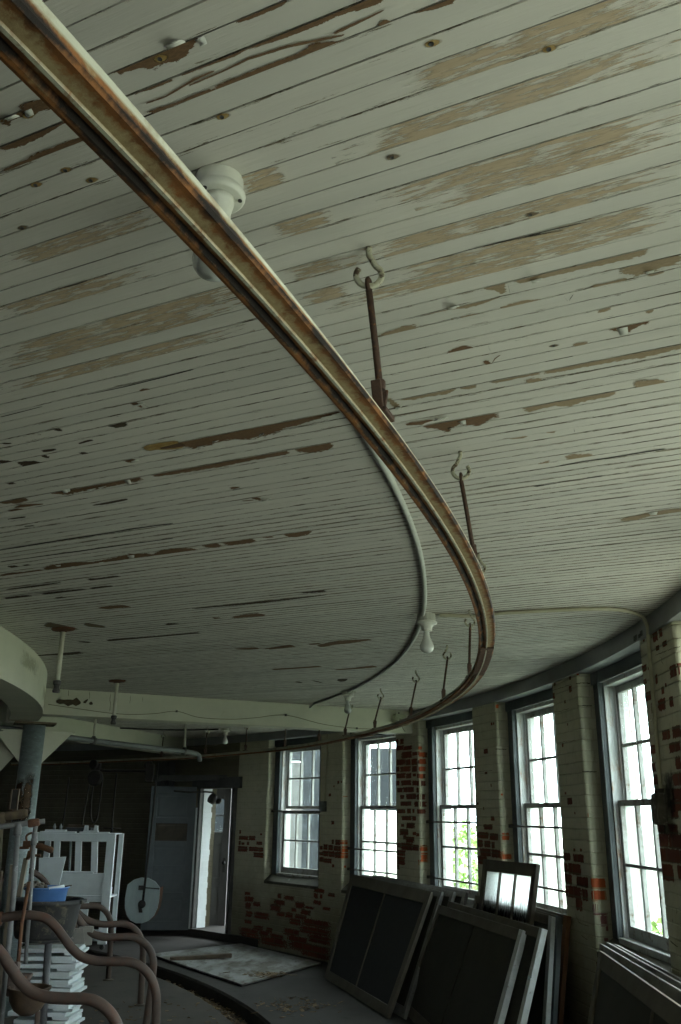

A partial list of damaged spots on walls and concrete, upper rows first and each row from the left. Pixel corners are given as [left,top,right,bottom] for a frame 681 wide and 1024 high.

peeling [114,36,207,74]
peeling [135,0,392,115]
peeling [388,104,681,211]
peeling [303,205,681,320]
peeling [181,412,340,450]
peeling [406,413,499,433]
peeling [523,392,616,412]
peeling [0,531,312,599]
peeling [396,739,428,870]
peeling [477,802,512,865]
peeling [650,725,681,882]
peeling [562,843,608,941]